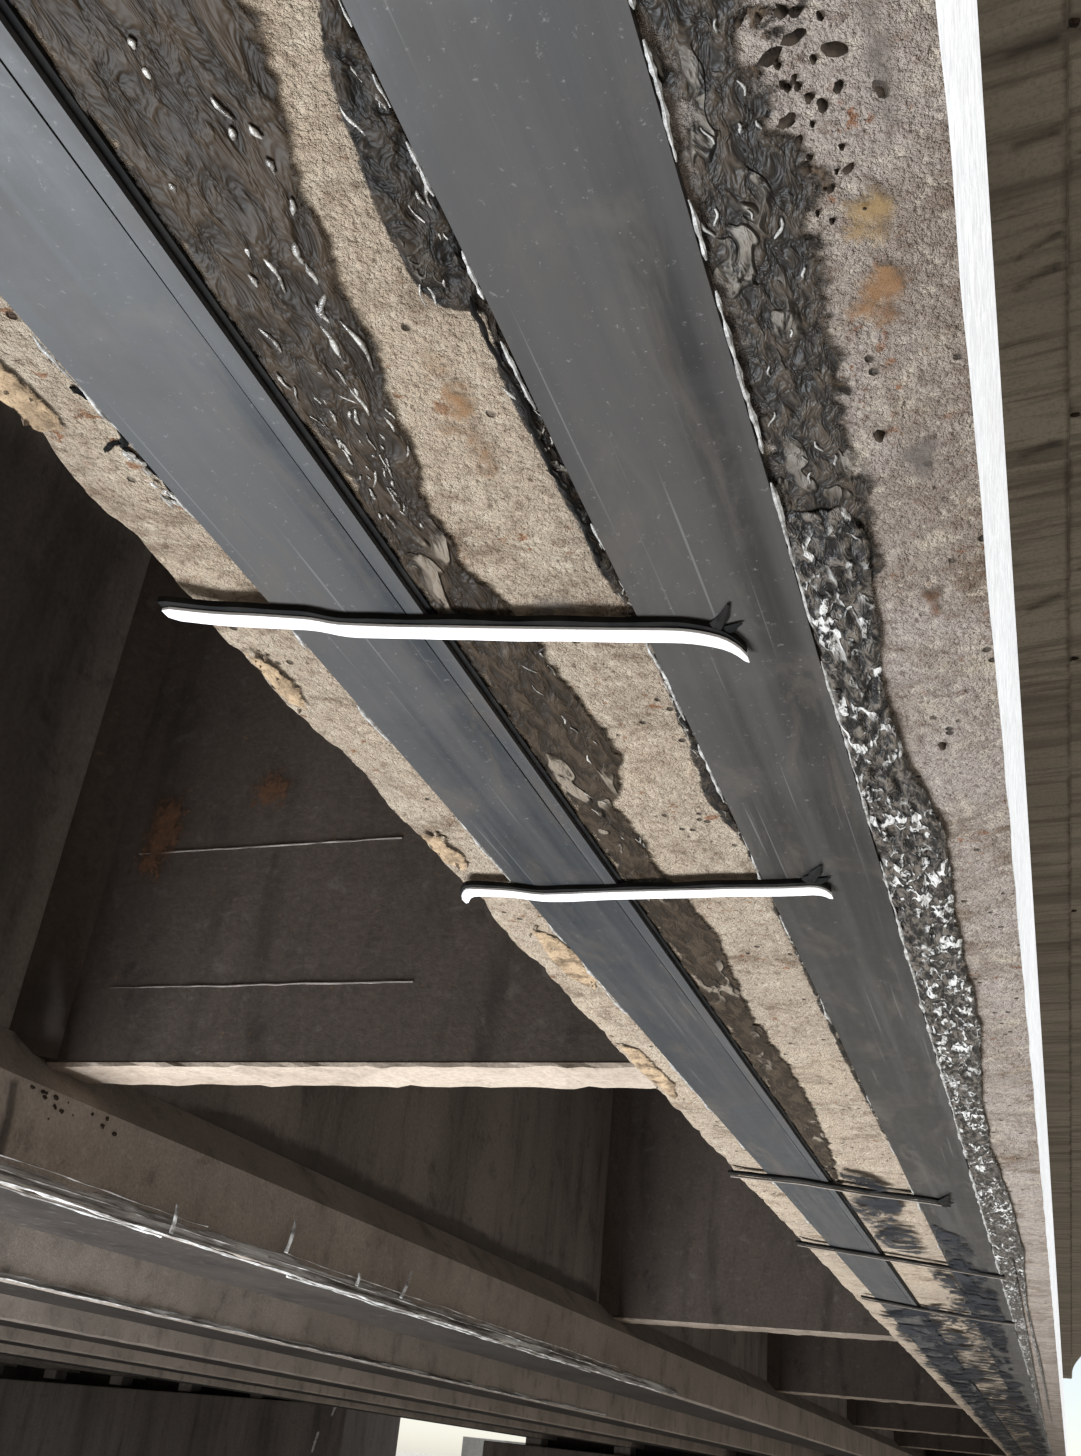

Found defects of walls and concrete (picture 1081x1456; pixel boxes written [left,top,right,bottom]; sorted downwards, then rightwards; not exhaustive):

spalling [0,364,65,432]
spalling [421,833,469,871]
peeling [784,507,1053,1431]
spalling [619,1045,685,1101]